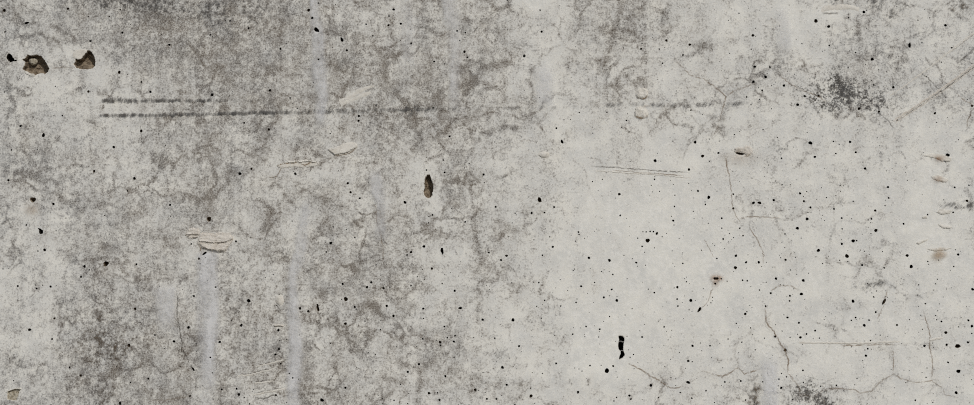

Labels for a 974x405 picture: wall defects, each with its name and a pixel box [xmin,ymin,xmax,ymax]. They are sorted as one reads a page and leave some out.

peeling [185,227,233,253]